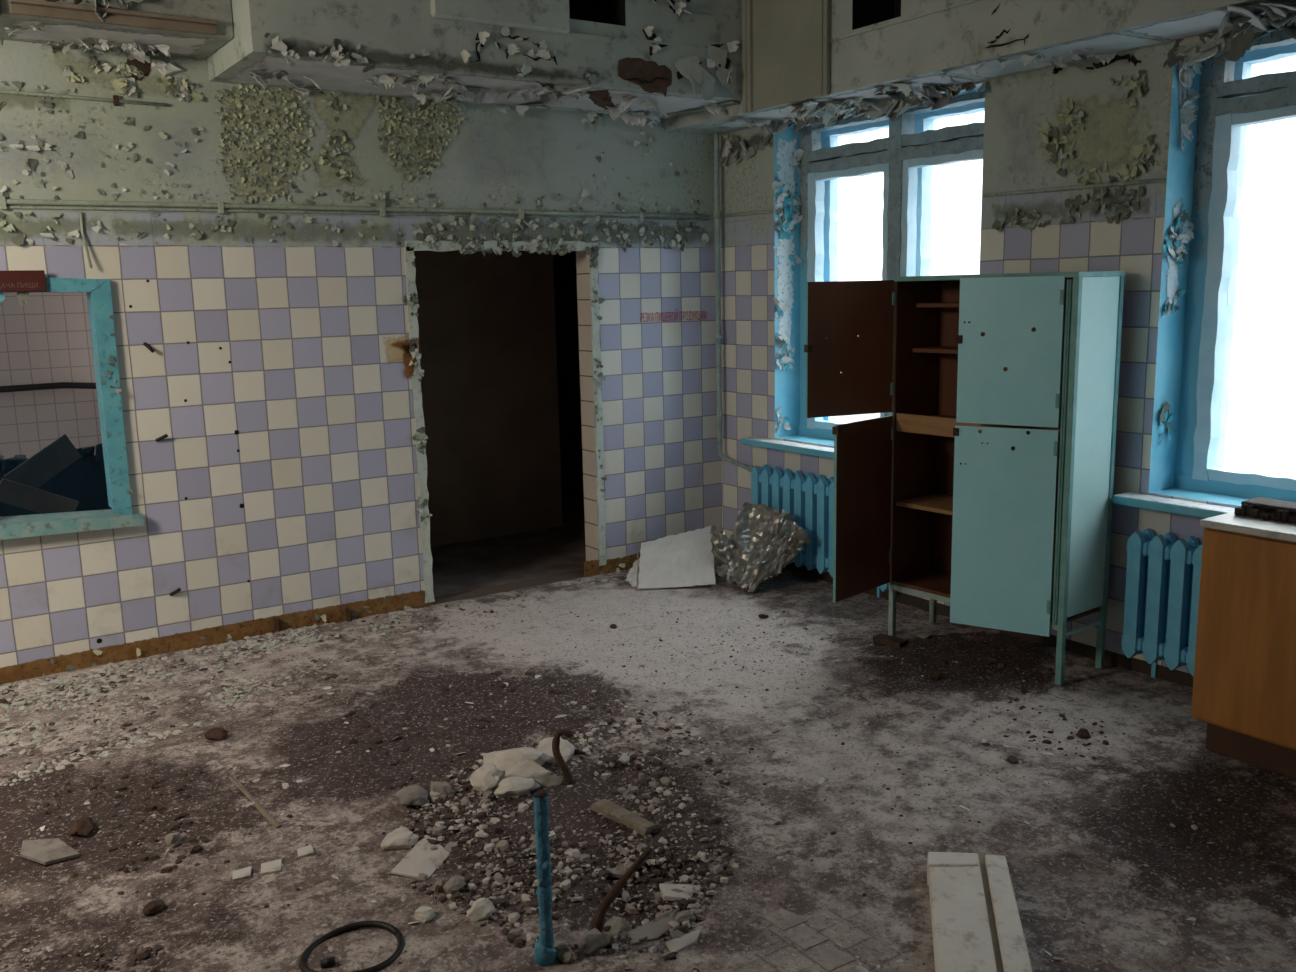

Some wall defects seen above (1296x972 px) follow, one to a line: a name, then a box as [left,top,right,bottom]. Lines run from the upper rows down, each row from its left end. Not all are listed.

peeling [408,340,424,382]
peeling [593,356,606,421]
peeling [412,427,428,455]